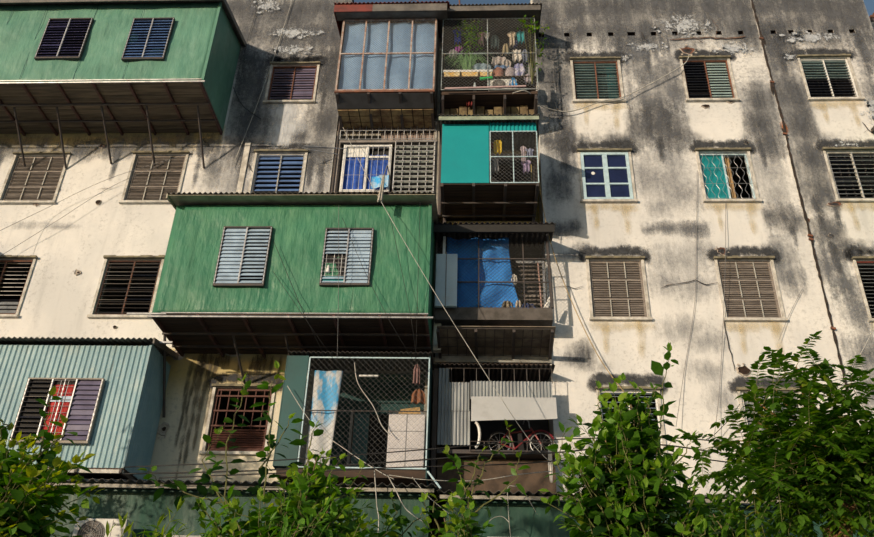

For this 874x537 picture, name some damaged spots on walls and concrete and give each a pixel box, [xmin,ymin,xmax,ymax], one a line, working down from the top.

water stain [0,0,351,193]
peeling [252,0,281,14]
peeling [269,27,324,54]
peeling [622,15,712,61]
water stain [533,0,874,403]
water stain [176,354,284,477]